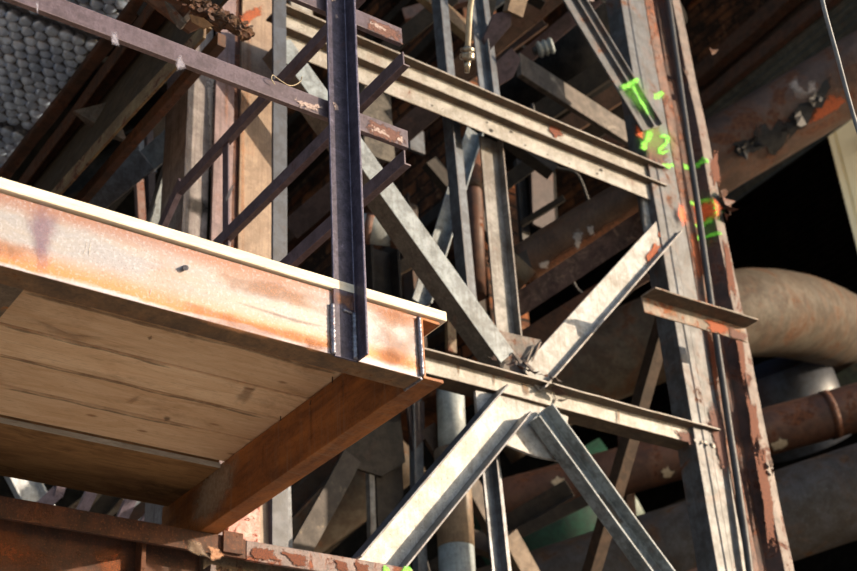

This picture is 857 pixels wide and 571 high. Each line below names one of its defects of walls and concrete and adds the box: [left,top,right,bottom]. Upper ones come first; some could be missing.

rust [810,94,851,123]
rust [710,150,739,215]
rust [644,231,661,263]
rust [689,228,704,285]
rust [722,236,737,300]
rust [705,318,749,390]
rust [671,401,731,476]
rust [745,392,777,547]
rust [96,550,124,571]
peeling [190,541,223,560]
peeling [249,546,308,568]
peeling [334,559,369,571]